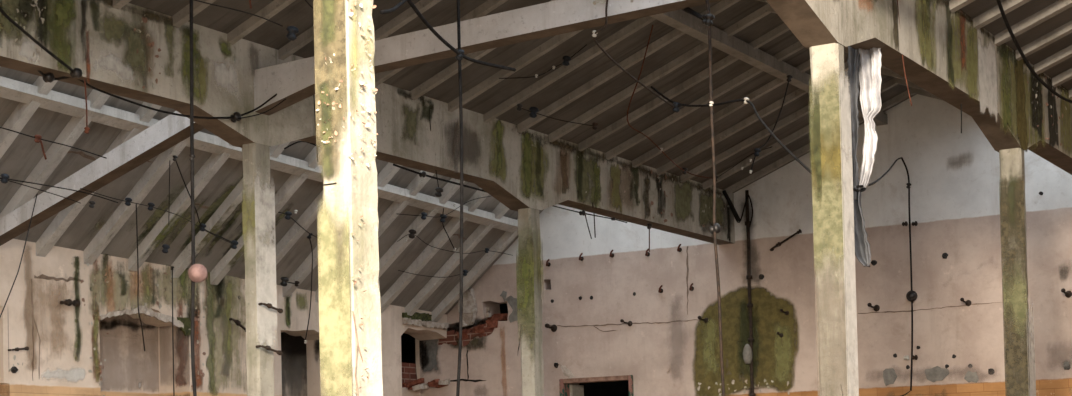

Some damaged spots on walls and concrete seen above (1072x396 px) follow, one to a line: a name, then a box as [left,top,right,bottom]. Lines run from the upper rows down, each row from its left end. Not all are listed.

damp [0,0,190,84]
damp [916,0,970,84]
damp [398,90,434,144]
damp [523,132,543,195]
damp [560,151,666,219]
damp [809,100,822,192]
damp [997,46,1072,152]
damp [75,254,245,395]
spalling [438,307,508,347]